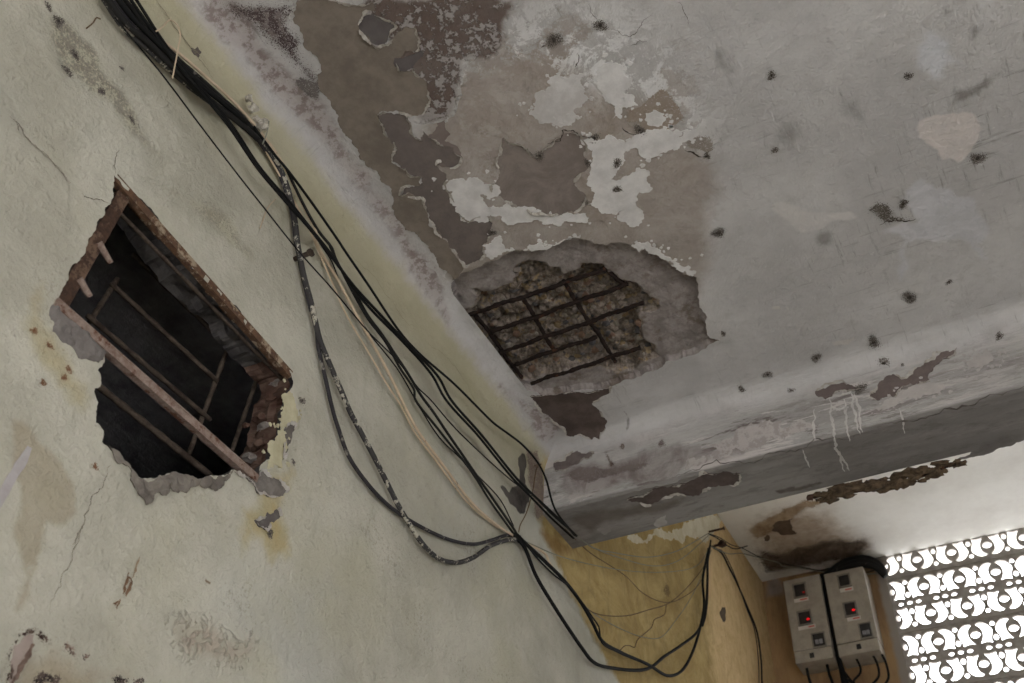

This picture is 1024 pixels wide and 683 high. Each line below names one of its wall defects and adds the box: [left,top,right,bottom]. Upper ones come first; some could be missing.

spalling [293,0,719,483]